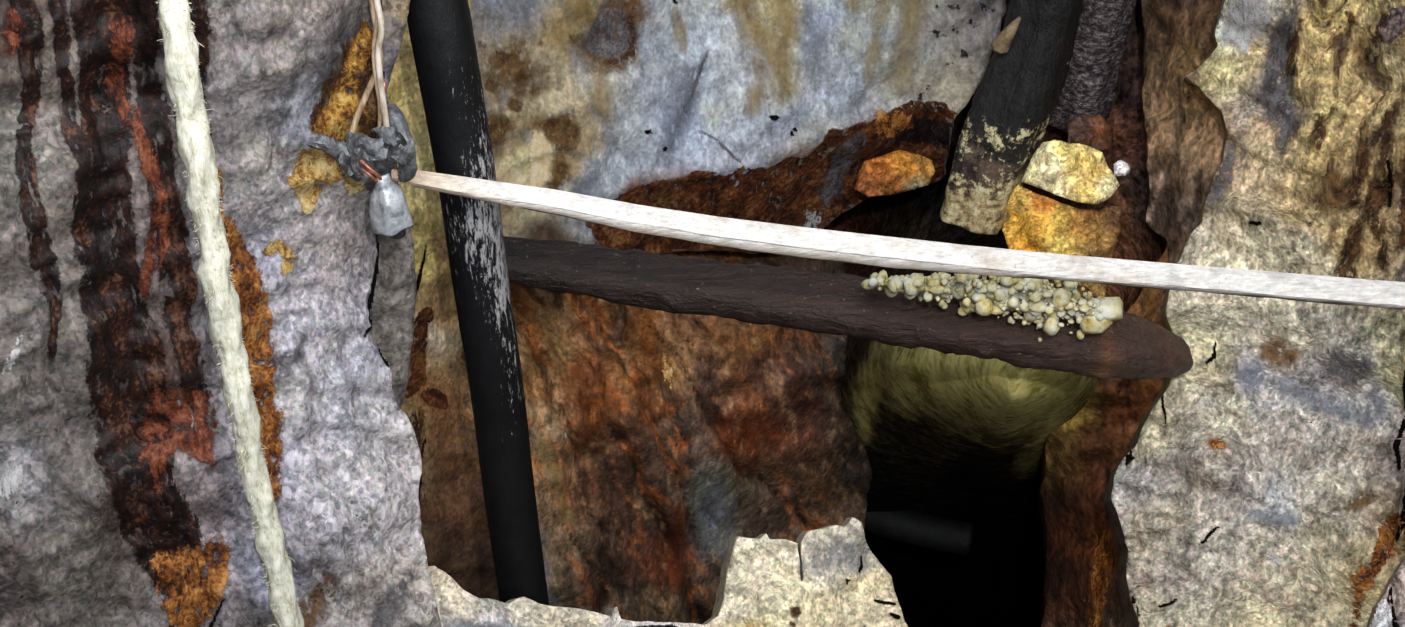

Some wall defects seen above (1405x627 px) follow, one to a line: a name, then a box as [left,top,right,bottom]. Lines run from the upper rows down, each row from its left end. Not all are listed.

rust [615,100,957,229]
rust [585,221,757,253]
rust [0,0,234,627]
rust [218,168,285,501]
rust [1347,492,1374,509]
crack [1393,369,1405,541]
rust [1347,512,1403,627]